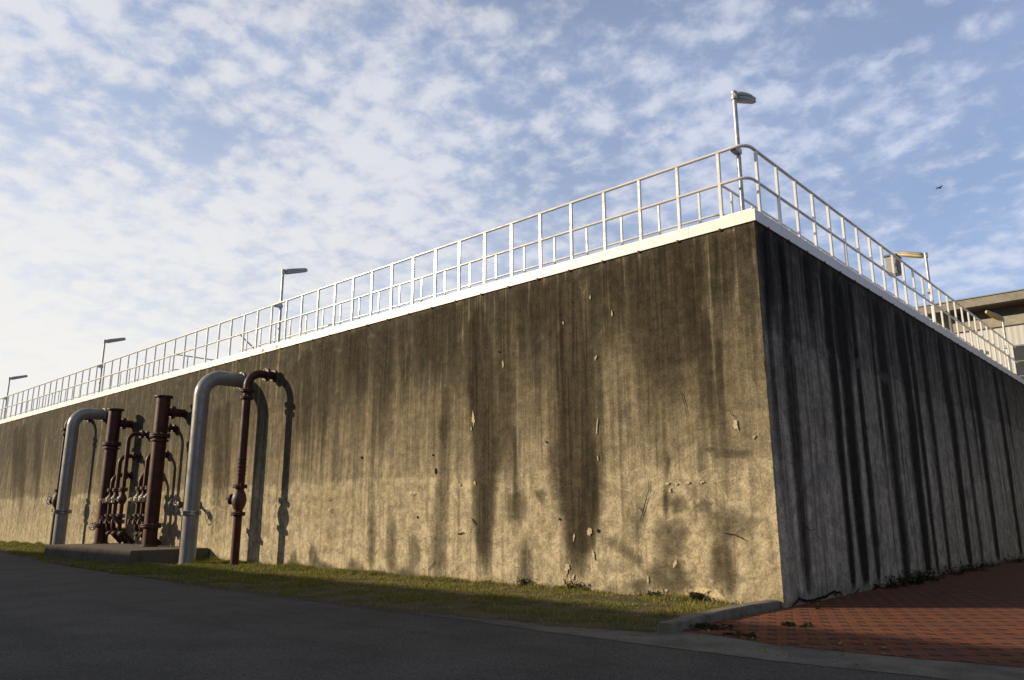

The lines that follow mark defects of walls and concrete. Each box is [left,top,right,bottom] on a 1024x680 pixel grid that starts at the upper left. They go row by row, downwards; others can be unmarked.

damp [309,546,331,569]
damp [468,307,498,566]
damp [519,270,608,571]
crack [792,584,881,606]